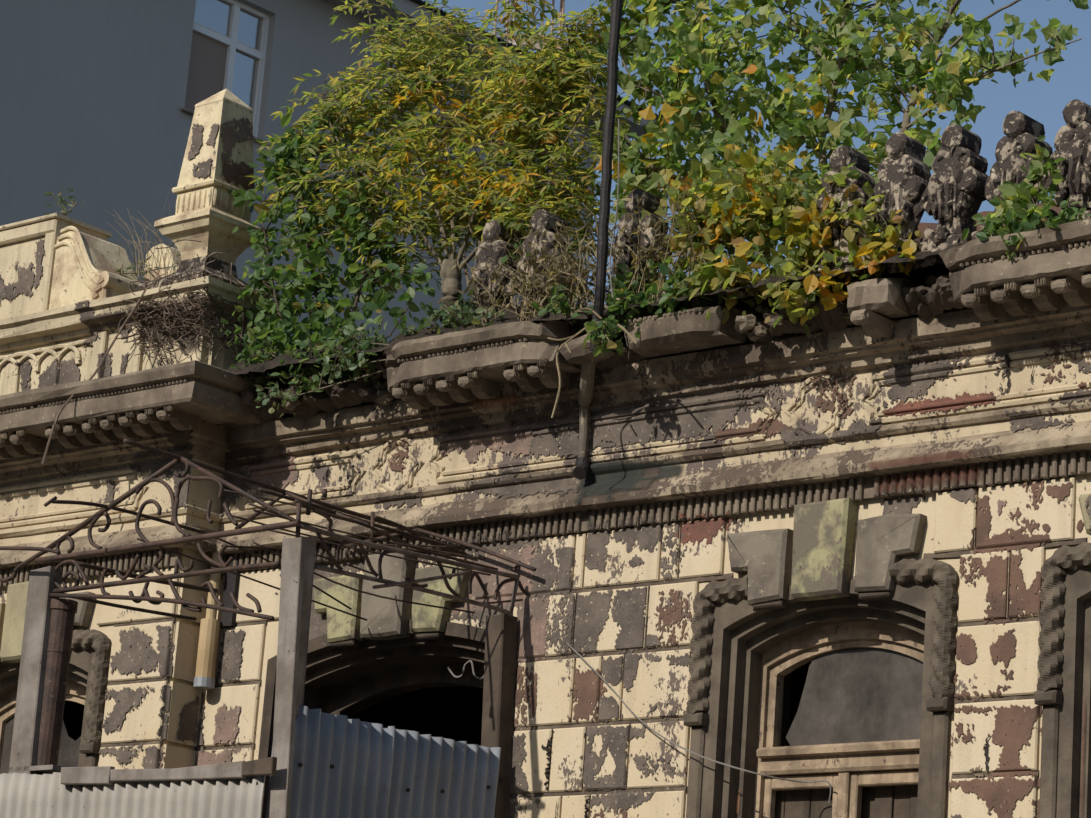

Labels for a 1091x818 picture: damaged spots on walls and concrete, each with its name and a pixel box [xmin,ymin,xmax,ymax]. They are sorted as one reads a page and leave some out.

peeling [188,118,255,190]
peeling [0,239,45,303]
peeling [219,449,300,518]
peeling [388,439,409,473]
peeling [376,492,422,509]
peeling [438,346,1011,498]
peeling [1004,339,1091,432]
peeling [308,549,384,641]
peeling [99,625,240,769]
peeling [215,629,245,684]
peeling [397,509,734,818]
peeling [948,476,1073,818]